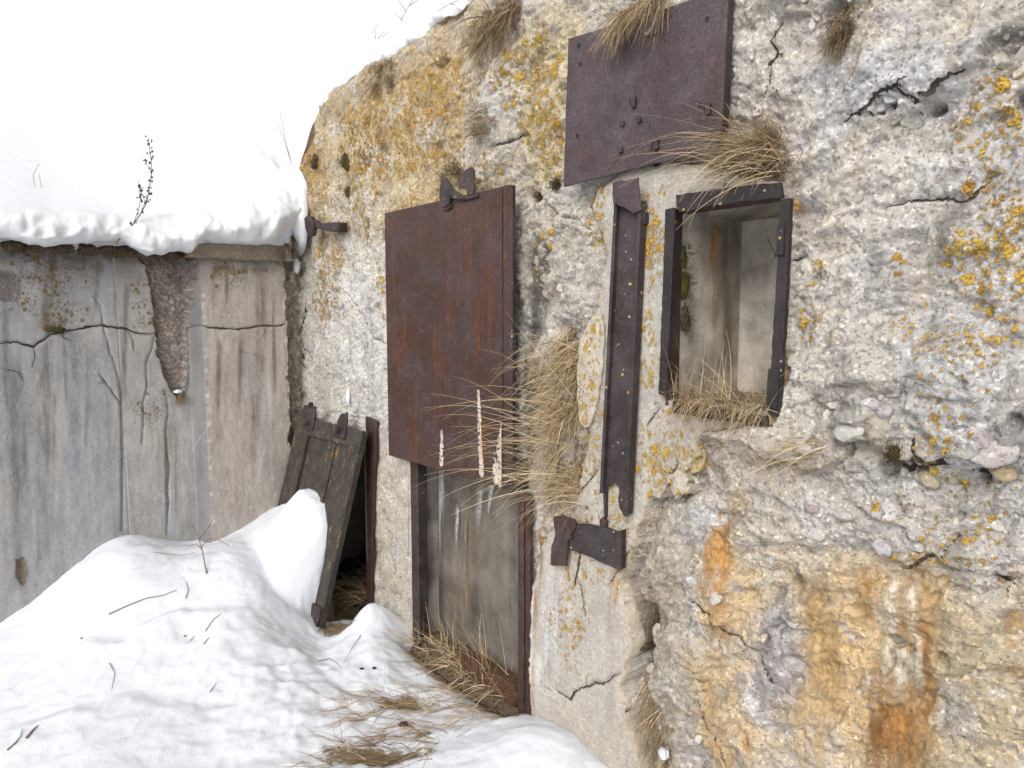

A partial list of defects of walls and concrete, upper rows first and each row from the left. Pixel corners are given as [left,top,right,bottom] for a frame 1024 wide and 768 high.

crack [843,68,966,122]
crack [886,176,995,208]
spalling [137,254,198,397]
crack [0,296,279,531]
corrosion [702,511,730,619]
crack [541,674,620,701]
corrosion [804,589,841,754]
corrosion [867,576,939,768]